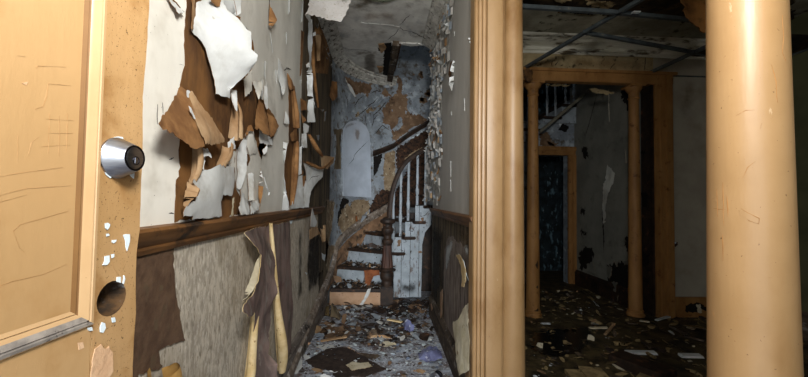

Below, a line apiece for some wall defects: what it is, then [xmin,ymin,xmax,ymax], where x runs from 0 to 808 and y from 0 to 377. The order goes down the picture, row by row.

flaking render [326,47,372,98]
peeling [174,0,277,222]
peeling [376,0,454,206]
peeling [105,223,130,251]
flaking render [337,198,370,239]
peeling [90,344,113,377]